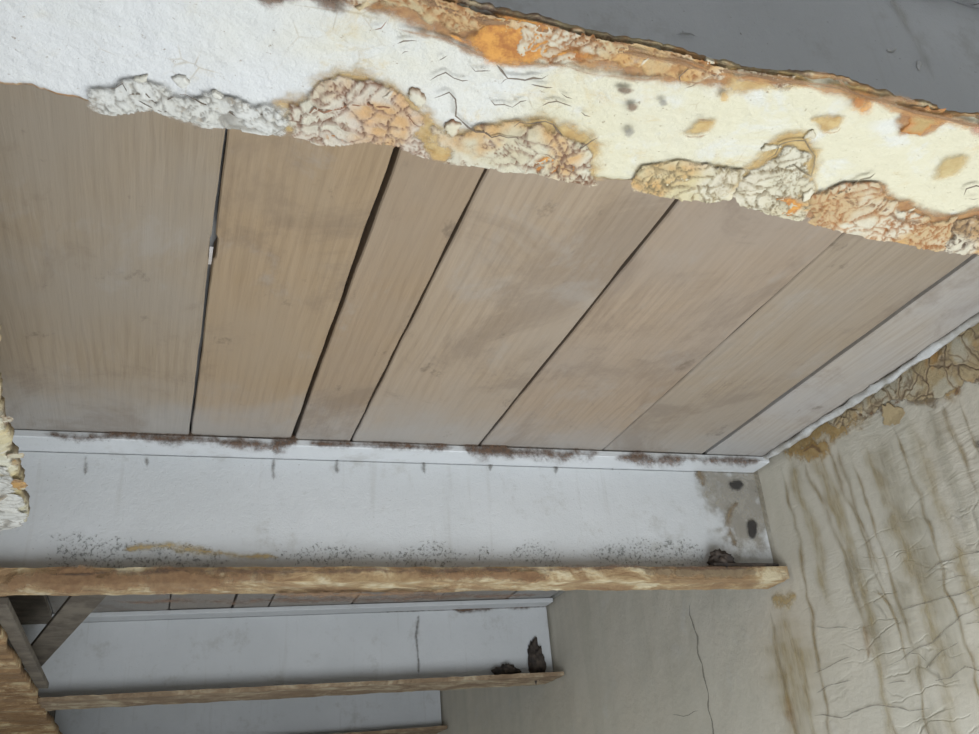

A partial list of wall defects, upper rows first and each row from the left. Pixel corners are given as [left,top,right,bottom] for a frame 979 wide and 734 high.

rust [318,0,979,129]
peeling [87,73,598,187]
rust [687,119,714,137]
rust [813,116,842,133]
peeling [631,129,817,221]
peeling [0,467,28,531]
leakage [50,534,235,568]
leakage [248,539,571,567]
crack [679,608,714,734]